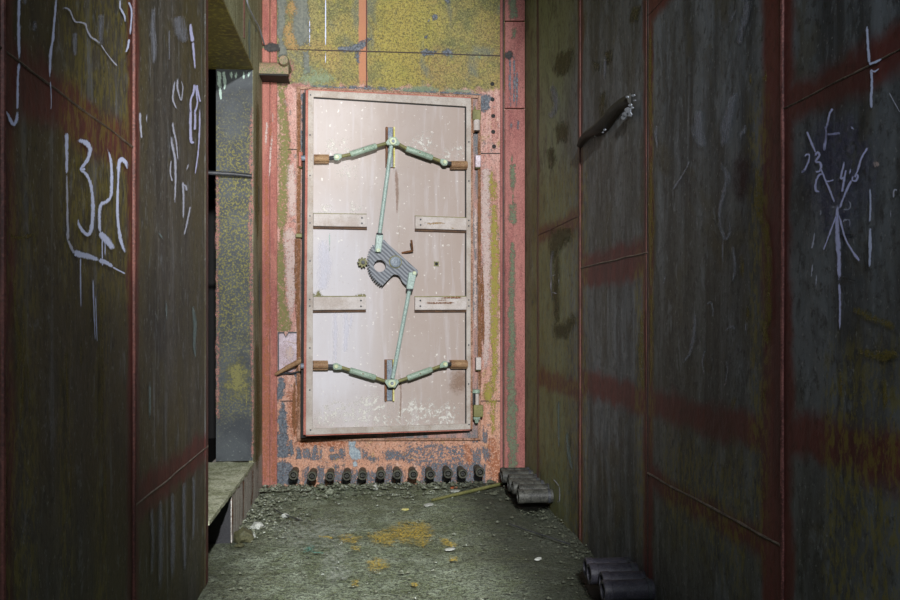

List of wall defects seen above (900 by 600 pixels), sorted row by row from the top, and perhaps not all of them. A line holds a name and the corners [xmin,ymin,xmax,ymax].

corrosion [477,169,485,358]
peeling [277,373,500,486]